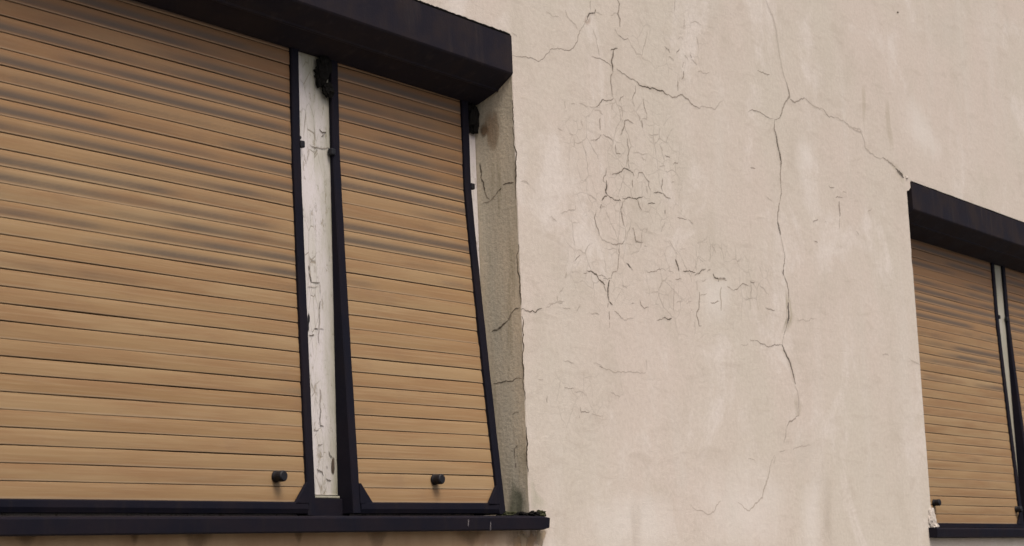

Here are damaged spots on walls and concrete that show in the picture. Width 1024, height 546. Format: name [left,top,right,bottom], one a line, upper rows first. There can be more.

crack [479,100,530,204]
crack [491,0,723,471]
crack [690,0,904,515]